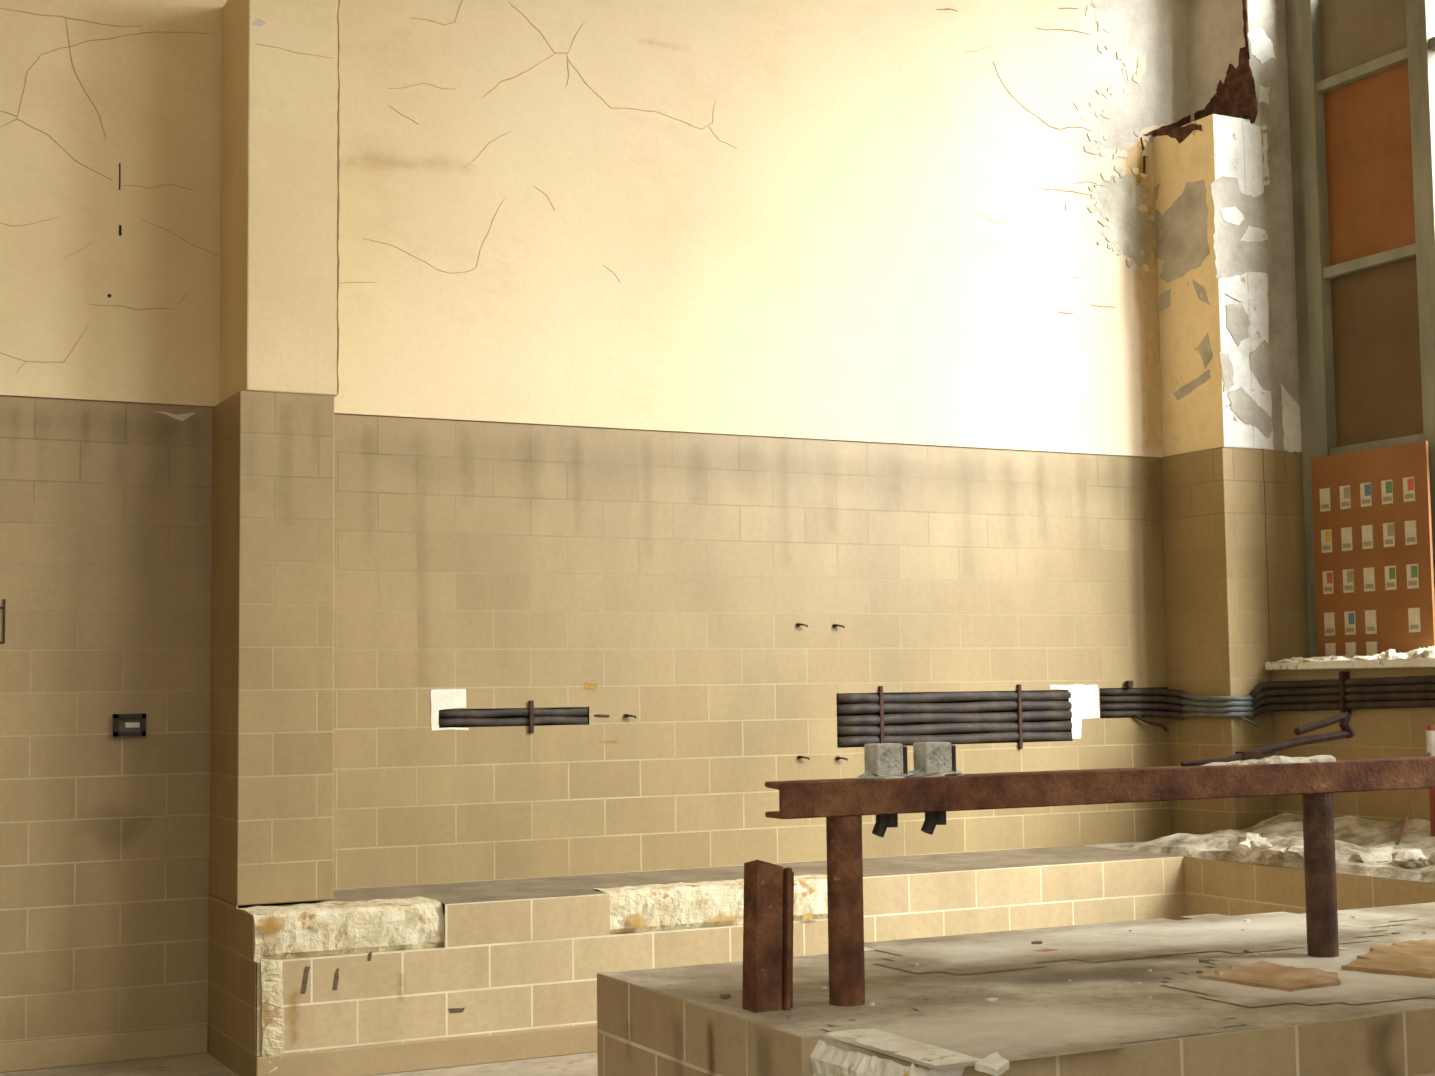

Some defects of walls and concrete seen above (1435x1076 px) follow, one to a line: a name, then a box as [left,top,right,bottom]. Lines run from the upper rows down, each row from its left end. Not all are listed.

crack [1036,7,1090,35]
crack [0,8,219,256]
crack [255,0,555,394]
crack [388,2,737,149]
crack [964,45,1093,132]
crack [1034,181,1103,211]
crack [1139,137,1147,174]
peeling [1073,0,1302,452]
spalling [593,879,744,934]
spalling [793,874,828,920]
spalling [239,896,444,1073]
spalling [810,1028,1010,1076]